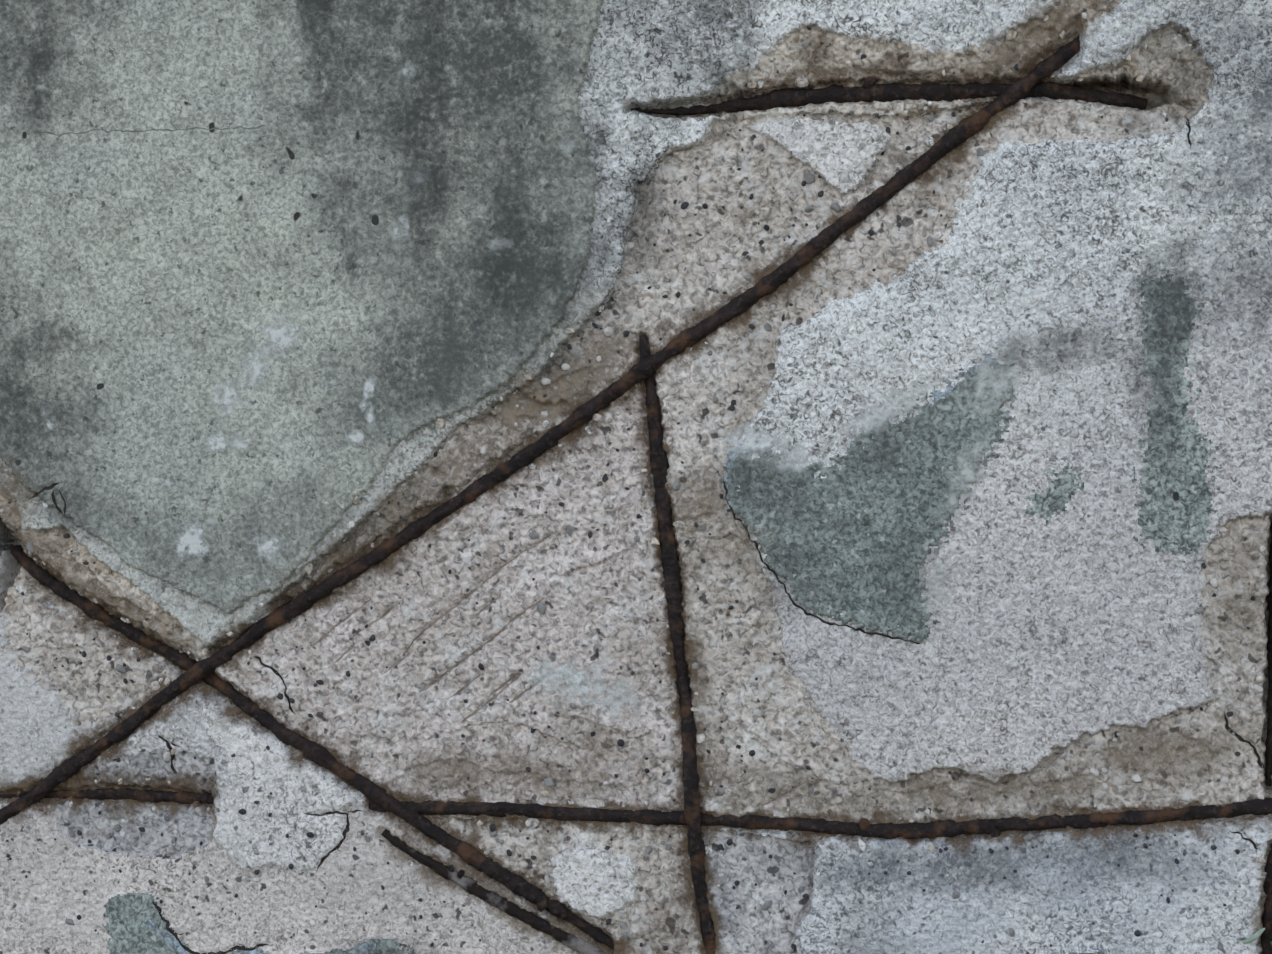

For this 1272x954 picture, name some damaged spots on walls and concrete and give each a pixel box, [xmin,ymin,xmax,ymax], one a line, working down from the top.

corrosion [726,54,907,101]
corrosion [898,0,1106,184]
damp [300,0,603,404]
damp [0,323,73,482]
damp [175,524,208,560]
damp [213,313,299,414]
flaking render [0,244,627,661]
spalling [0,383,703,954]
damp [348,379,375,443]
corrosion [0,205,1272,954]
flaking render [529,0,1272,824]
flaking render [702,814,1272,954]